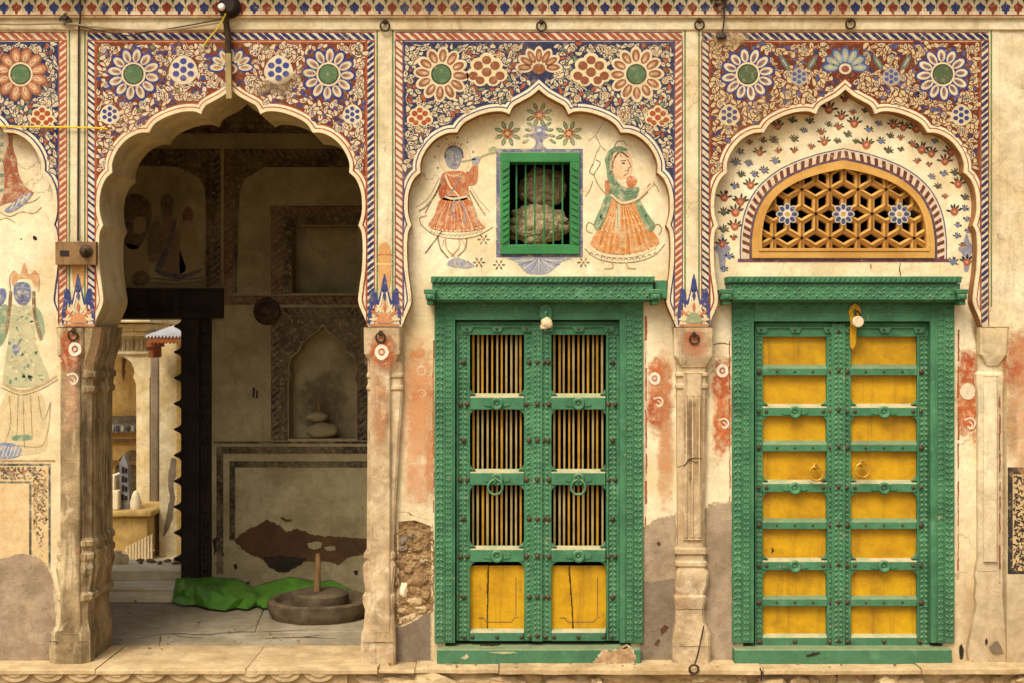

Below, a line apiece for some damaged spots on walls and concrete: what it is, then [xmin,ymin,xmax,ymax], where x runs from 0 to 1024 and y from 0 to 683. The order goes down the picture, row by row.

flaking render [232,517,367,575]
spalling [394,511,435,626]
flaking render [643,512,677,582]
peeling [593,644,636,664]